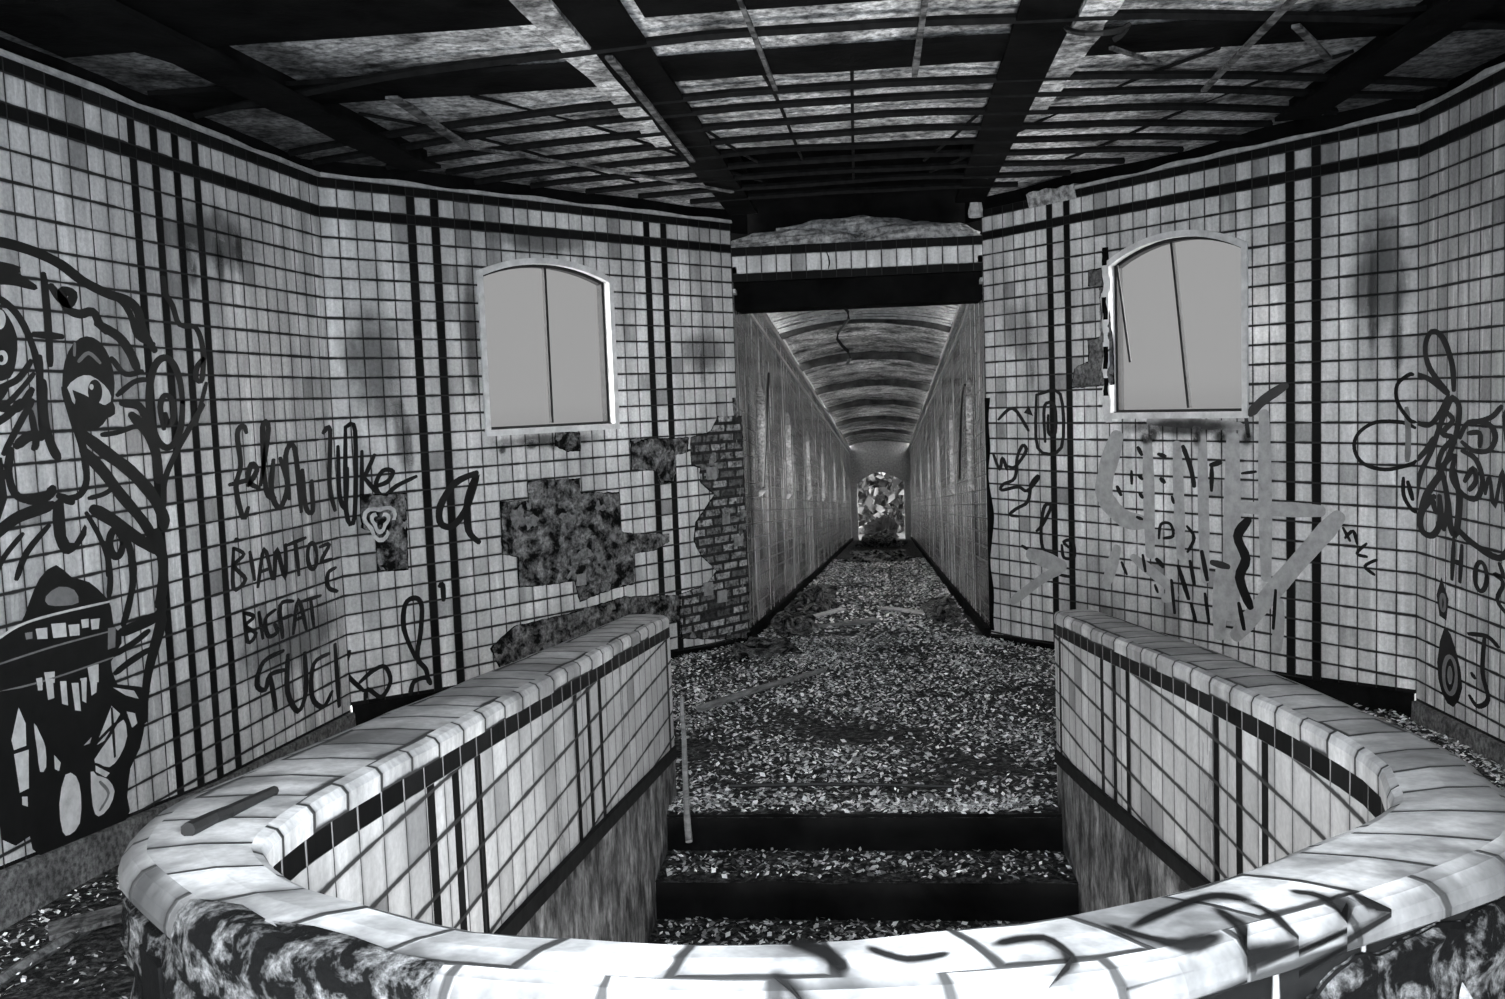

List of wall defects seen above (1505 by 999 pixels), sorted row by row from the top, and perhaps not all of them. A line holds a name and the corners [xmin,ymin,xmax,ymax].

peeling [490,397,750,667]
spalling [120,892,447,999]
spalling [1305,896,1505,999]